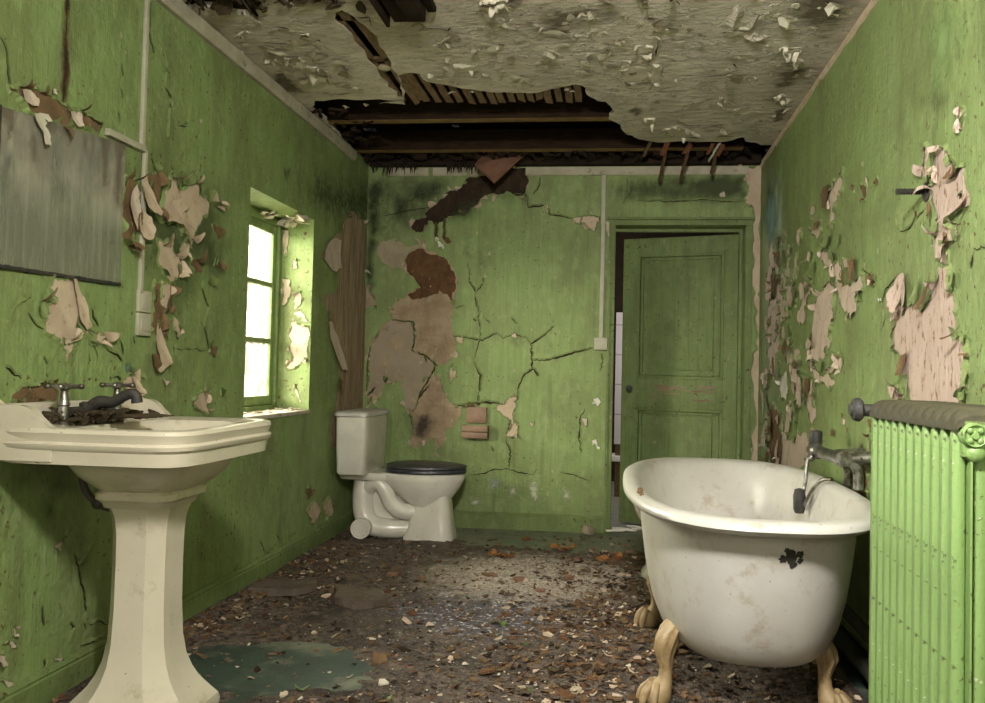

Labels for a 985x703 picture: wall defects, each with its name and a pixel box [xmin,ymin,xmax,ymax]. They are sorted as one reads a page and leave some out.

peeling [6,79,104,146]
peeling [236,19,405,109]
peeling [408,0,800,98]
peeling [643,55,795,143]
peeling [765,44,819,77]
peeling [817,2,854,17]
peeling [28,274,147,398]
peeling [122,156,230,386]
spalling [305,166,530,526]
crack [452,263,604,481]
peeling [738,162,879,470]
peeling [883,132,973,404]